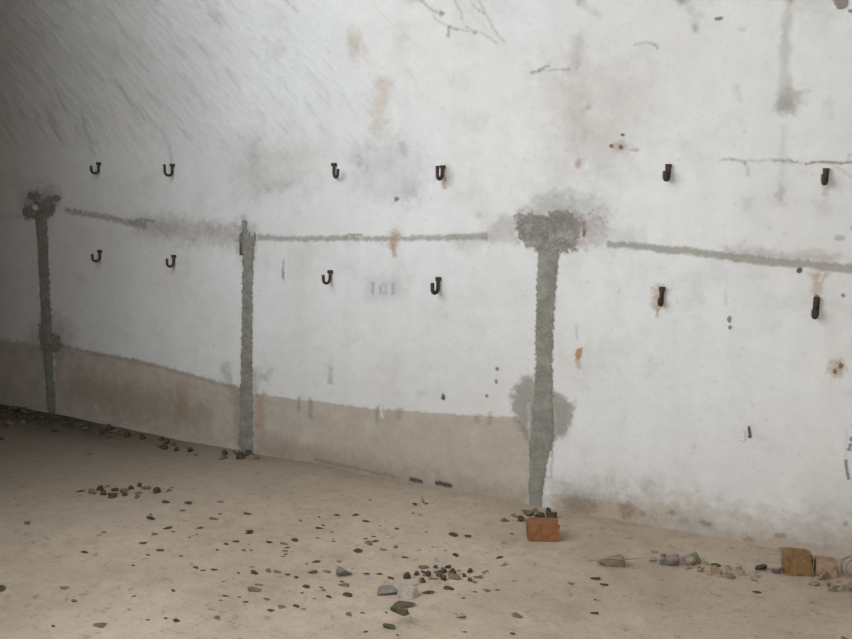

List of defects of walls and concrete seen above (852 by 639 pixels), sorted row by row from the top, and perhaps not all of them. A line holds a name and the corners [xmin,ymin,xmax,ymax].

spalling [832,0,852,13]